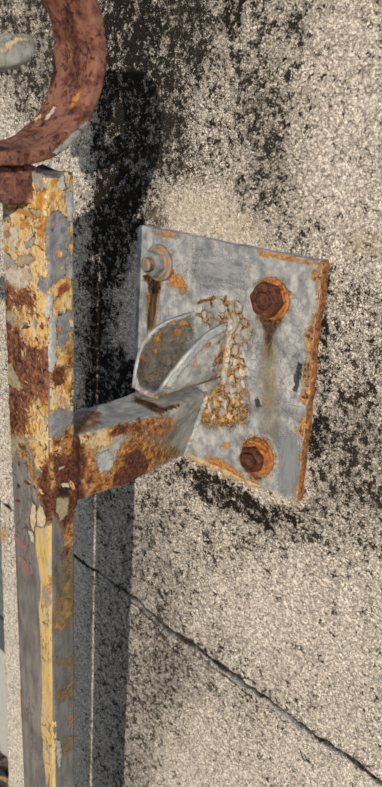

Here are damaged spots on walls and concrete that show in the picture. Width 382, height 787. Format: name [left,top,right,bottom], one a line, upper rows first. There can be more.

leakage [0,0,55,119]
corrosion [24,90,57,140]
corrosion [55,0,94,109]
leakage [84,0,319,407]
peeling [2,172,115,494]
corrosion [5,269,194,629]
corrosion [205,433,279,485]
corrosion [257,249,327,468]
crack [74,554,382,785]